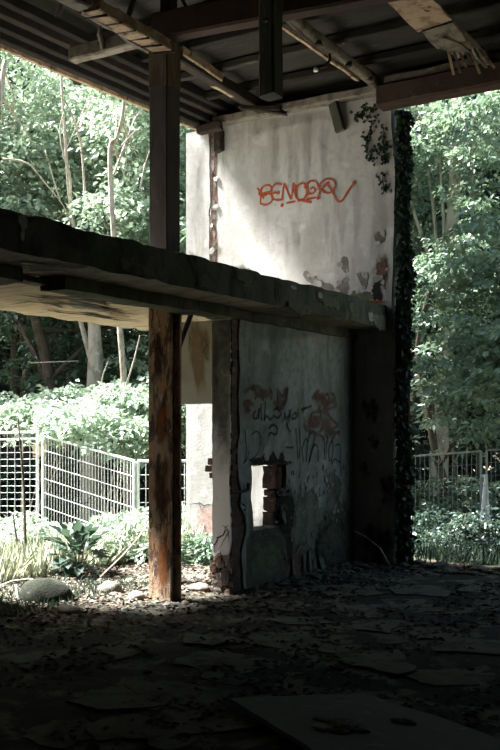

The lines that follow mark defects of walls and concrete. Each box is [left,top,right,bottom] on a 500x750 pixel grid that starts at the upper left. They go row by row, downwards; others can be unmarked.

flaking render [374,230,385,245]
spalling [303,256,388,301]
flaking render [230,320,244,527]
flaking render [253,465,340,576]
spalling [209,552,241,594]